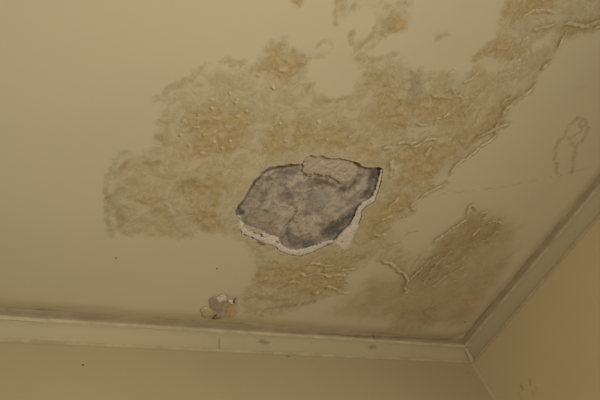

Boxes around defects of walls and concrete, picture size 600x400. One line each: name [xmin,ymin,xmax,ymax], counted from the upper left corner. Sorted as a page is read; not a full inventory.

spalling [235,155,397,257]
leakage [118,0,600,314]